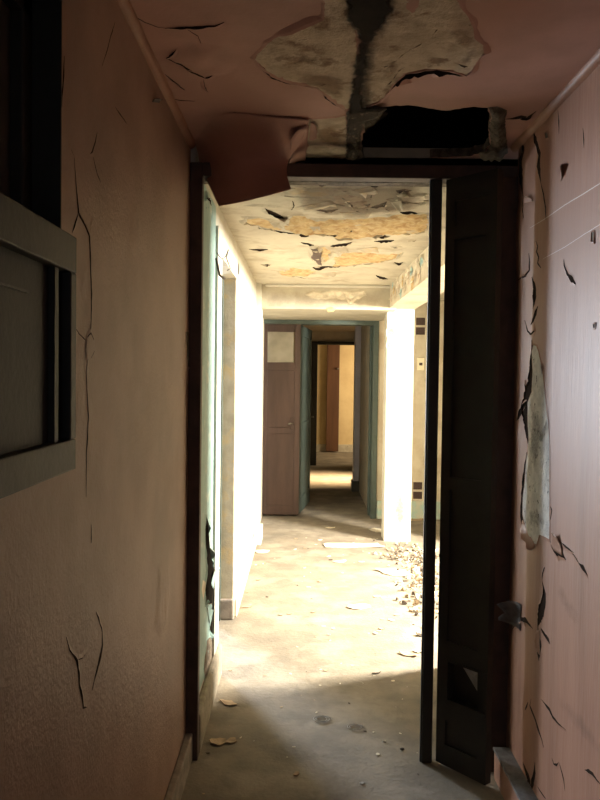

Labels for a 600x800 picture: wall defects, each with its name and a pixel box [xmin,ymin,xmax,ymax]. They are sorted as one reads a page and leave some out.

spalling [195,0,491,277]
leakage [347,0,394,161]
spalling [478,106,508,162]
crack [505,111,547,220]
crack [68,131,101,497]
peeling [388,254,428,303]
crack [563,258,576,287]
spalling [517,339,551,550]
peeling [201,566,220,625]
crack [512,505,588,661]
crack [66,611,103,711]
crack [523,698,566,800]